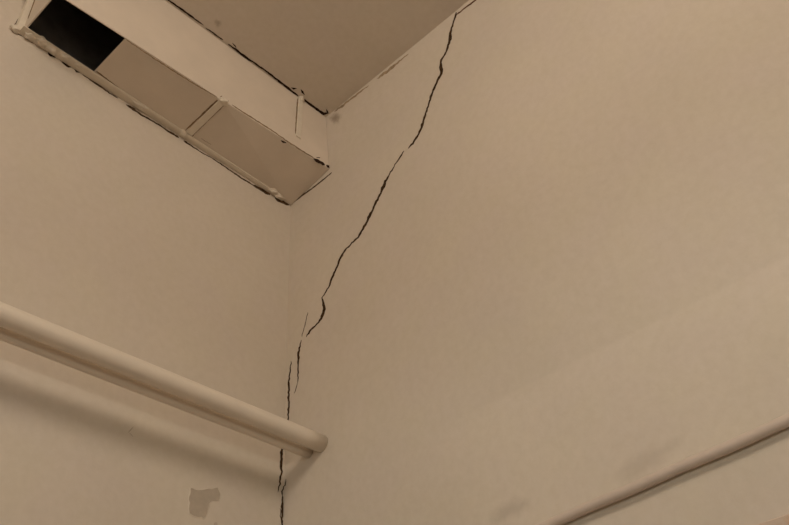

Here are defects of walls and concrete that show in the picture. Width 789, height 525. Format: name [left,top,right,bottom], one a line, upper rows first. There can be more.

crack [287,0,476,420]
peeling [188,487,221,520]
crack [278,449,286,525]